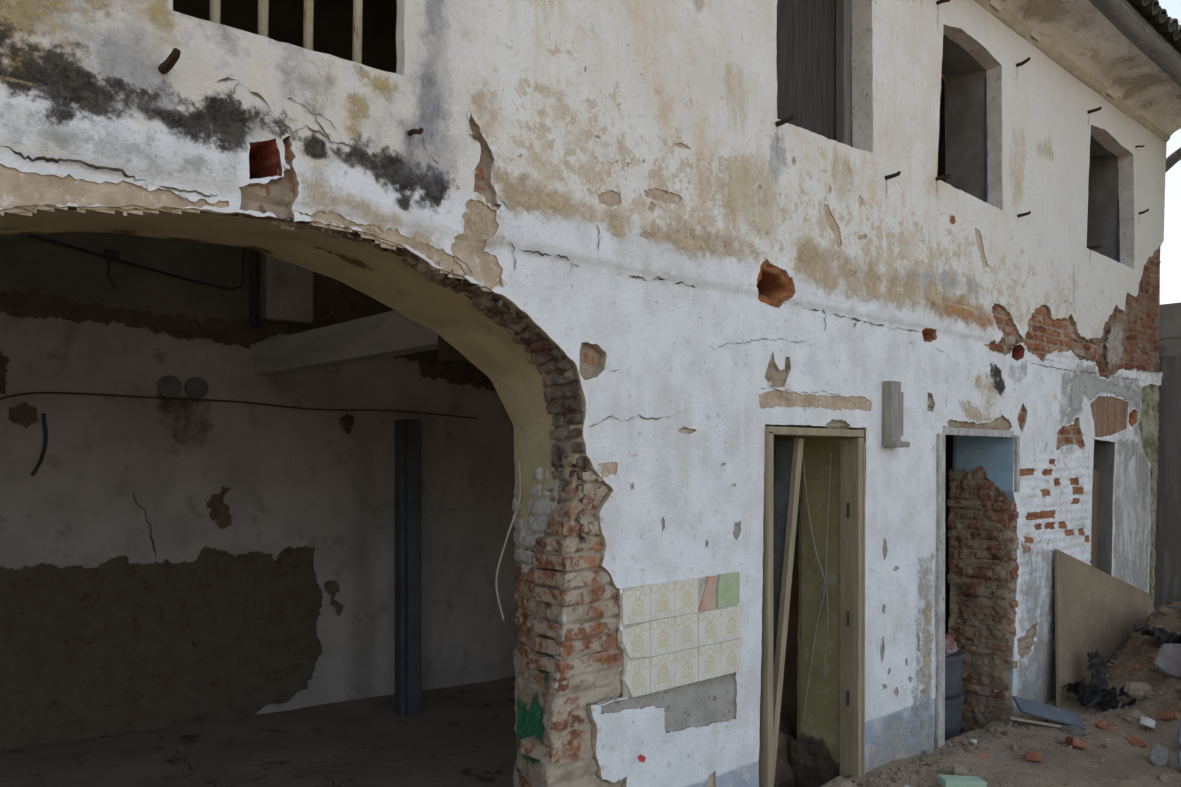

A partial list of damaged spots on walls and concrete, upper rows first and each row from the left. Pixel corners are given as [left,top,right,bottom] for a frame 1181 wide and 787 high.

damp [0,0,251,151]
damp [304,63,458,211]
spalling [756,257,795,308]
damp [798,240,995,327]
crack [132,493,156,557]
flaking render [0,108,737,787]
peeling [759,352,872,429]
flaking render [946,246,1161,734]